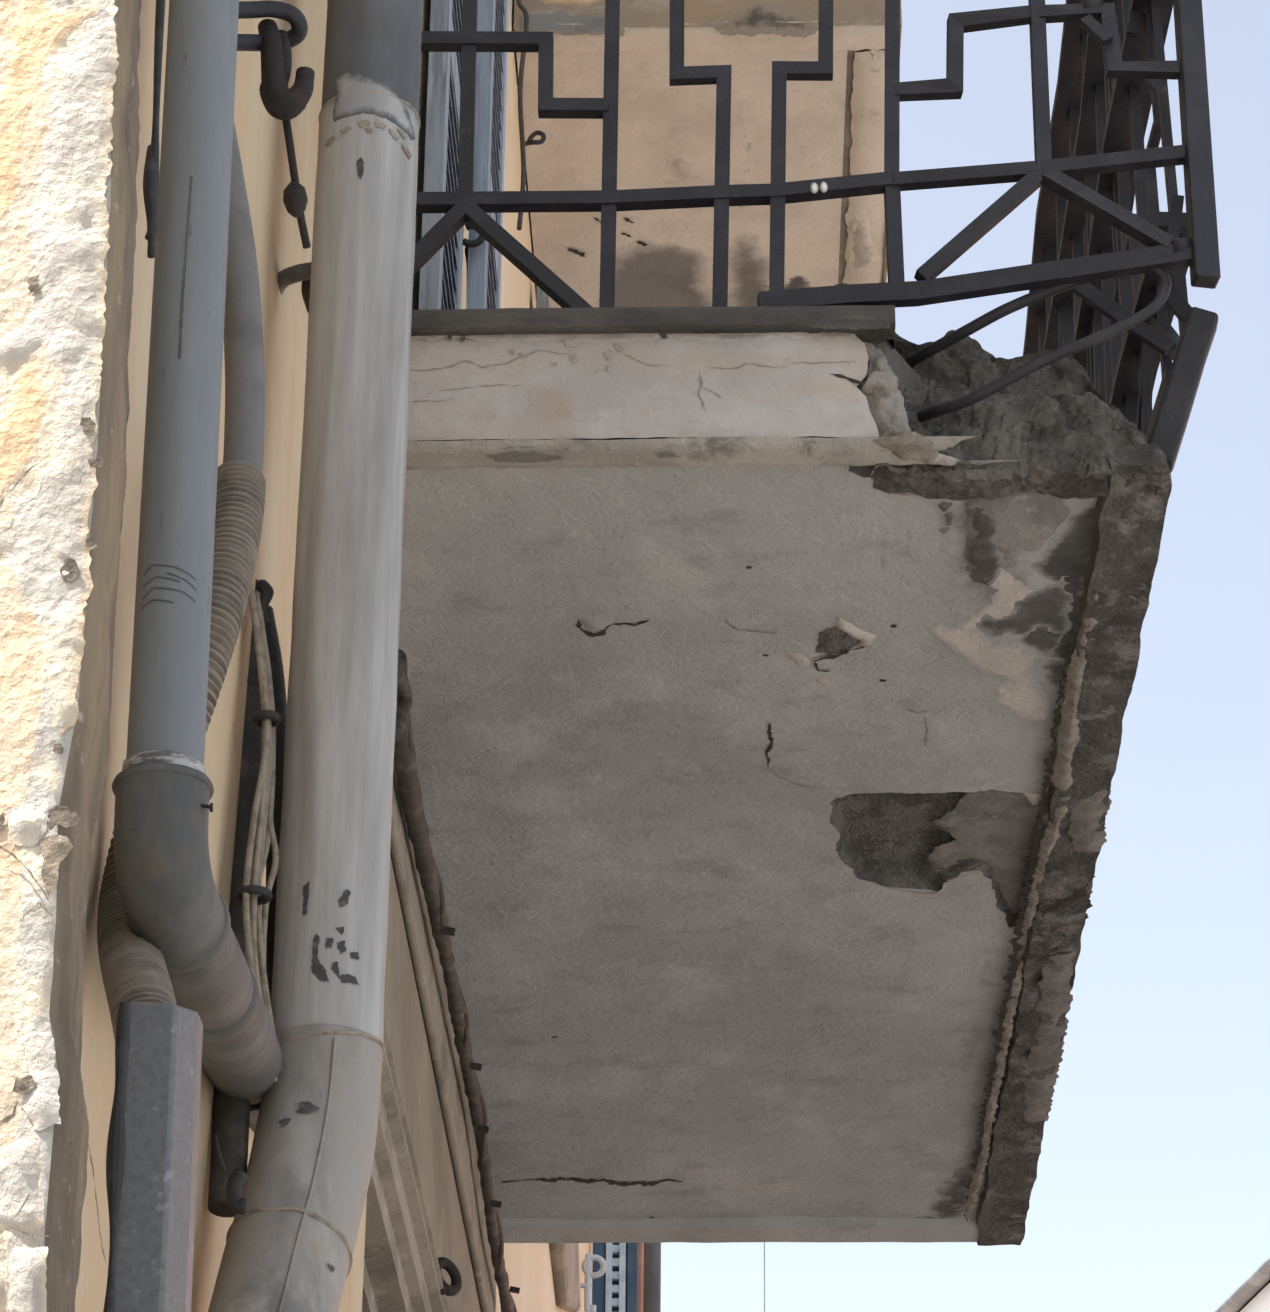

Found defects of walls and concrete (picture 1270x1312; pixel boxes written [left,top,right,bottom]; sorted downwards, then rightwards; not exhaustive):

leakage [615,232,811,307]
crack [408,350,567,402]
crack [697,361,866,412]
spalling [849,330,1166,551]
crack [546,602,651,637]
flaking render [813,617,876,672]
leakage [934,497,1098,713]
crack [765,723,831,790]
flaking render [830,568,1112,1122]
flaking render [965,960,1024,1219]
crack [501,1177,683,1187]